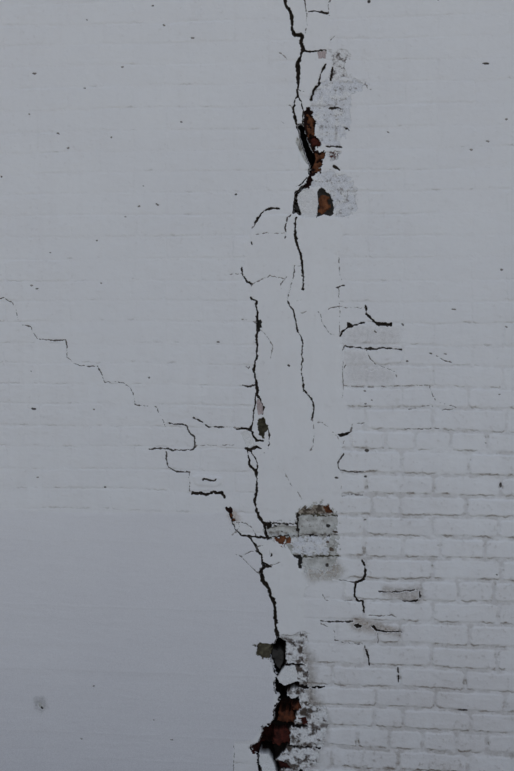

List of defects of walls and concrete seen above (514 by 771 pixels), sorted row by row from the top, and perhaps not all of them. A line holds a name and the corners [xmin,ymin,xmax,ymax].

crack [279,0,335,127]
spalling [292,49,365,219]
crack [0,207,456,638]
spalling [266,500,341,573]
crack [320,560,422,666]
spalling [248,631,331,771]